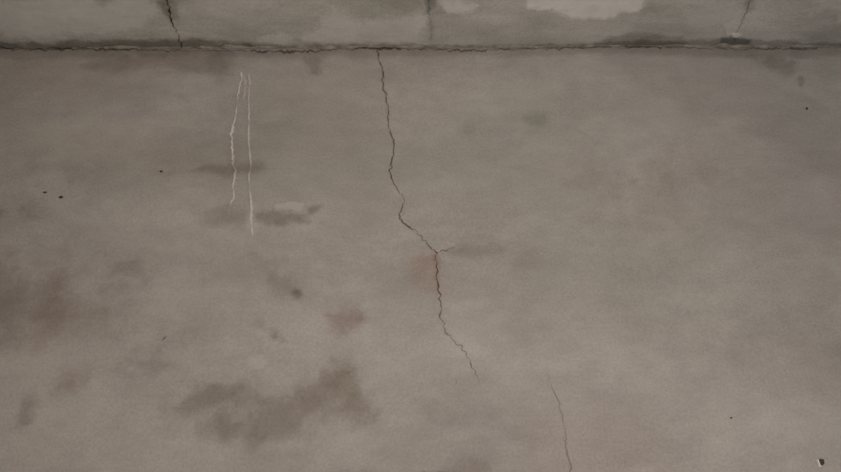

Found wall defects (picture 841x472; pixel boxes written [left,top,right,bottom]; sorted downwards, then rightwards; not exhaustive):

crack [722,18,747,38]